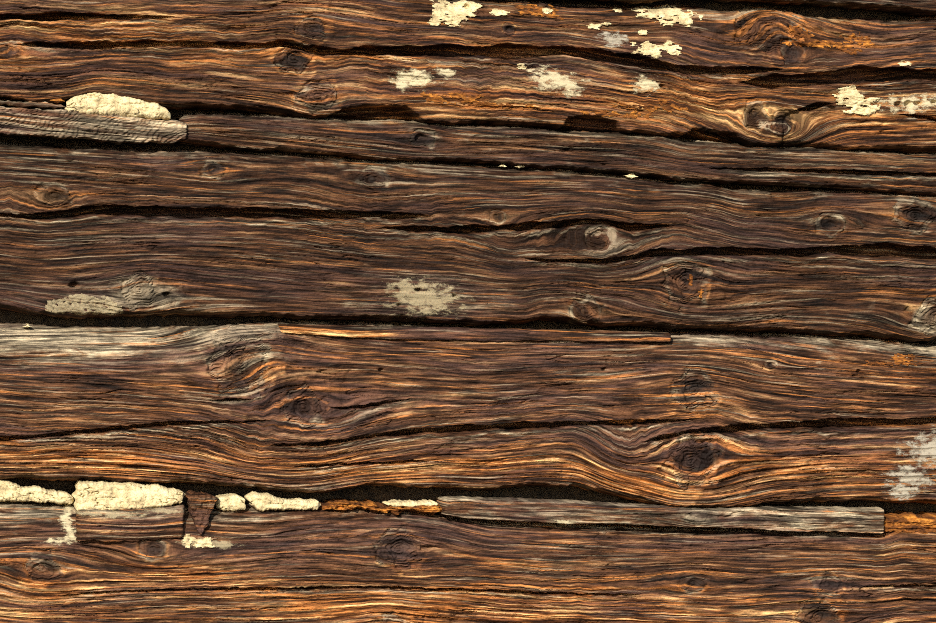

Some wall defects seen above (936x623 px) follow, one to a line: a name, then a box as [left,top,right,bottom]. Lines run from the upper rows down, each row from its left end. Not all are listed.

efflorescence [602,31,628,47]
water stain [879,94,936,114]